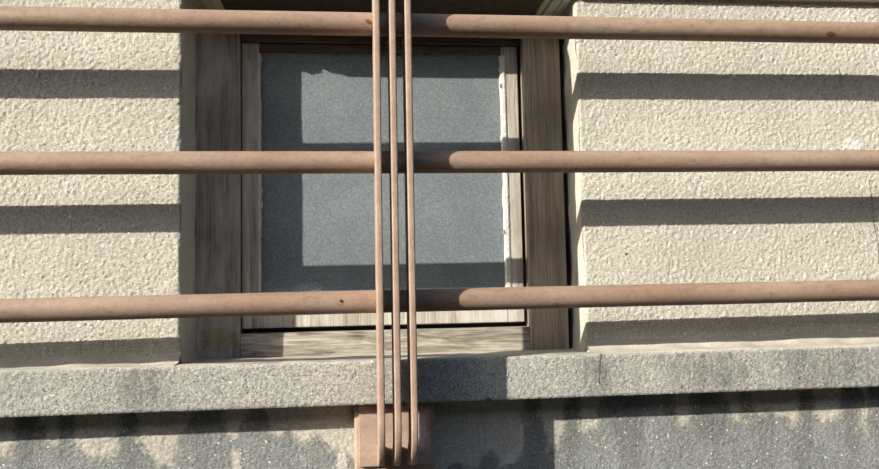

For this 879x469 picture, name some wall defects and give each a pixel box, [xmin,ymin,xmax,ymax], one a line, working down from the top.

water stain [0,408,355,469]
water stain [474,387,879,469]